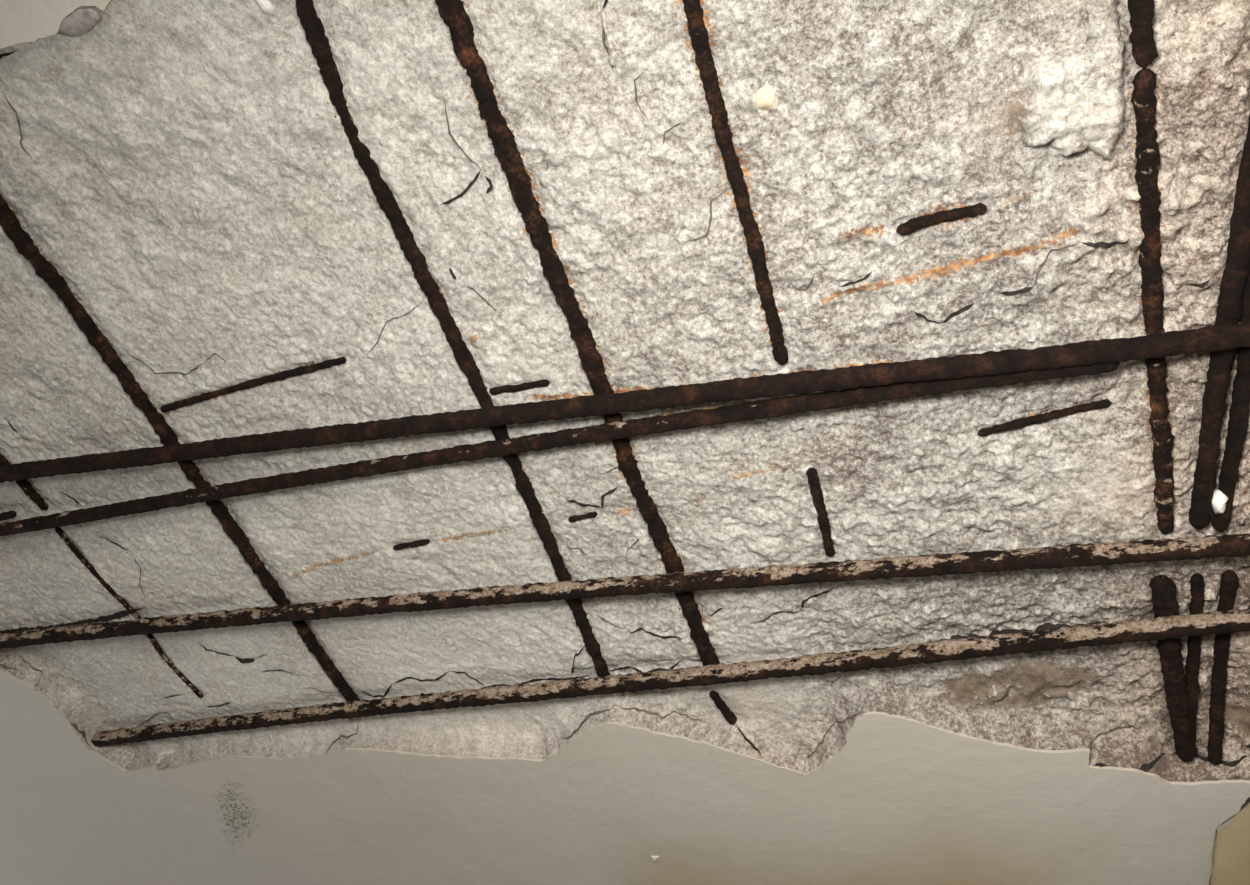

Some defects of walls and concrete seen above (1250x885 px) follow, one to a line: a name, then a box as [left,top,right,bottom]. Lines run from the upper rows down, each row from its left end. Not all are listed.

corrosion [754,86,776,111]
spalling [0,0,1250,532]
corrosion [822,224,1089,304]
corrosion [524,391,594,401]
corrosion [437,528,511,542]
corrosion [292,552,373,578]
spalling [0,348,1250,782]
crack [751,587,837,623]
crack [907,621,1107,646]
crack [196,616,701,697]
crack [563,705,706,739]
crack [736,725,761,754]